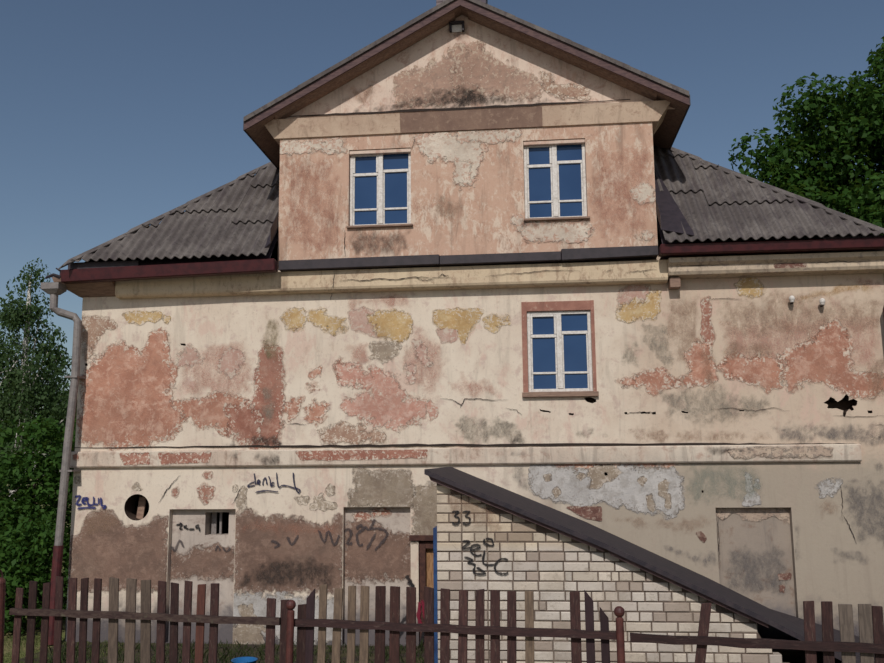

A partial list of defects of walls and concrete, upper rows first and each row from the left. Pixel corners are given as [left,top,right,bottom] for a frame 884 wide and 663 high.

peeling [391,40,590,109]
water stain [416,89,499,108]
crack [330,274,450,300]
peeling [615,285,662,323]
peeling [433,307,512,345]
peeling [615,297,884,417]
peeling [68,307,439,645]
peeling [528,463,685,521]
water stain [241,563,329,585]